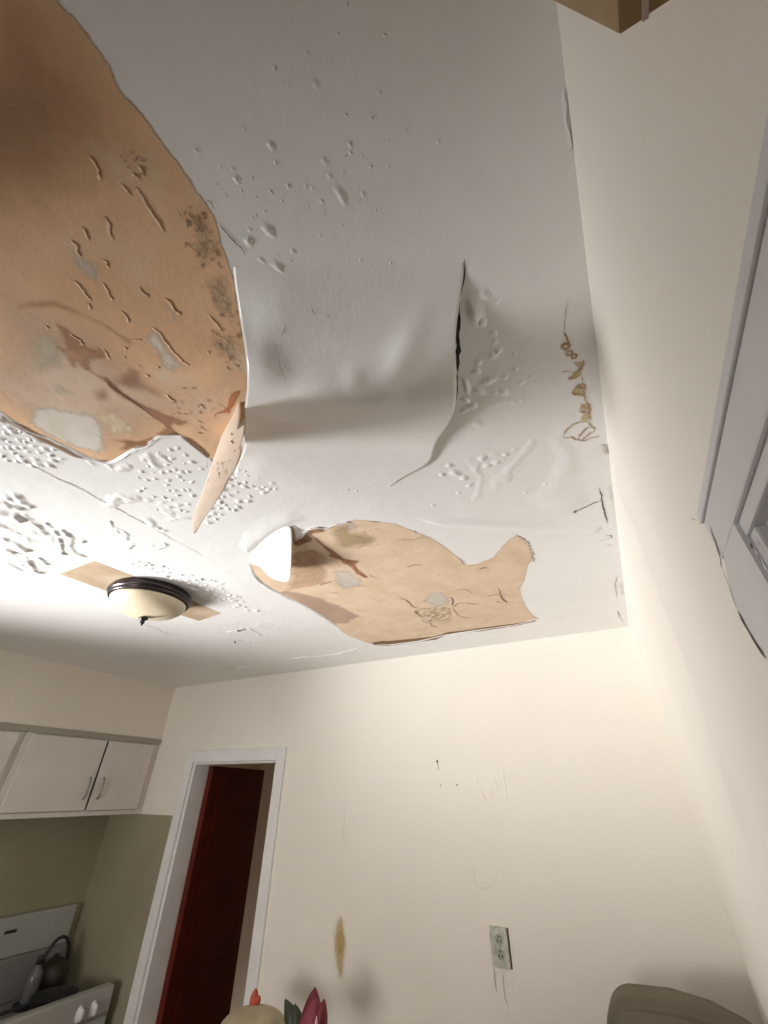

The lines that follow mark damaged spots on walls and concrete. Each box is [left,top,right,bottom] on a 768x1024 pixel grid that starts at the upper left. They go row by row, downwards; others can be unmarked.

peeling [123,327,190,369]
peeling [32,408,133,453]
spalling [416,592,451,622]
water stain [335,920,345,975]